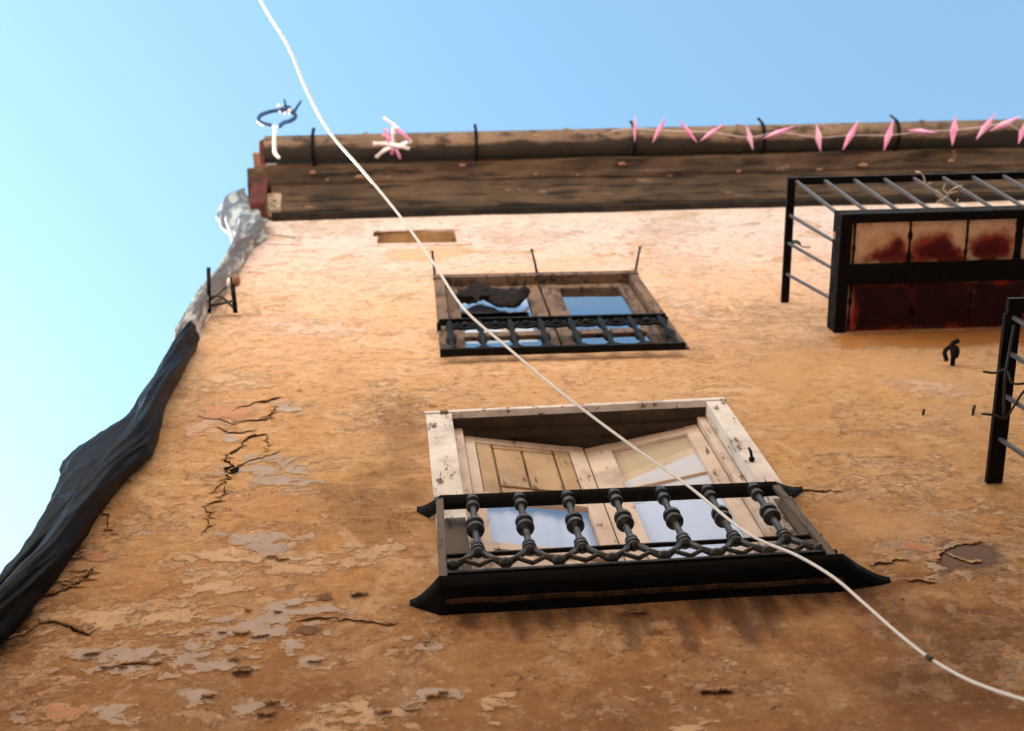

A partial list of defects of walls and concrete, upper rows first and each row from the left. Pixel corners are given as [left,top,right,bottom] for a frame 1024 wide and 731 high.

corrosion [865,233,1012,263]
corrosion [849,280,1024,331]
crack [198,396,281,532]
peeling [175,365,324,496]
crack [803,486,841,494]
crack [8,550,103,639]
peeling [0,526,412,731]
crack [295,614,398,625]